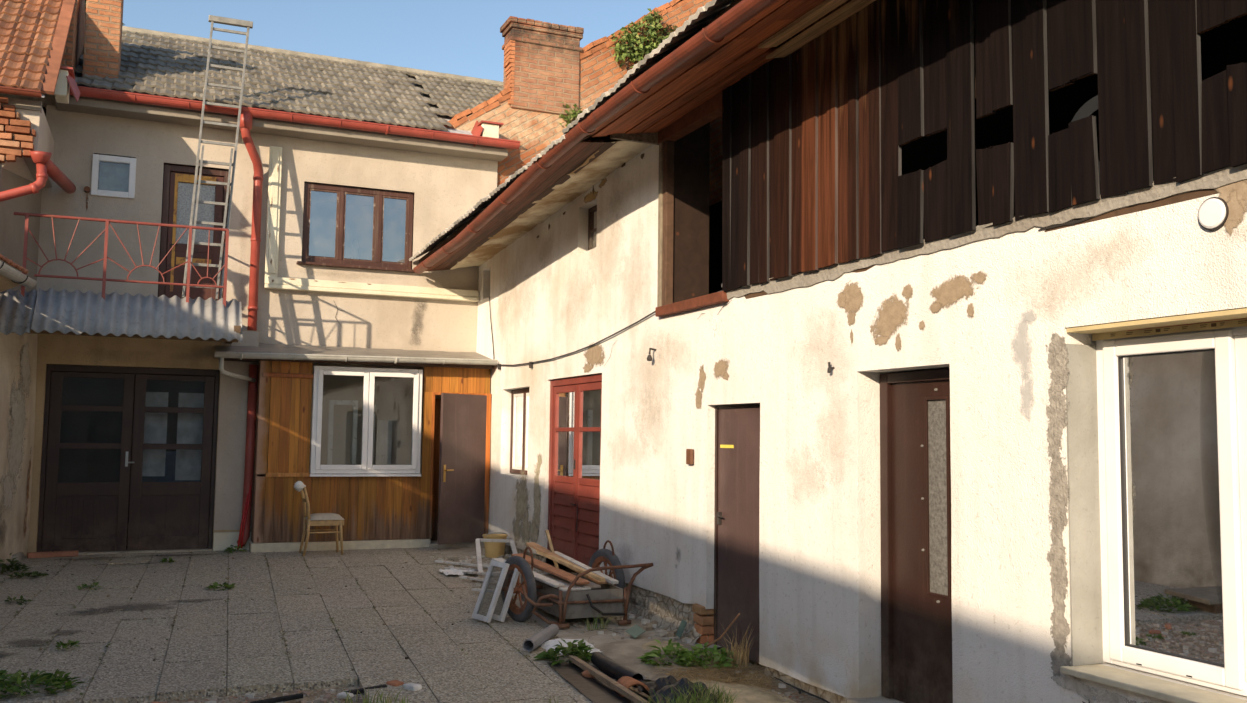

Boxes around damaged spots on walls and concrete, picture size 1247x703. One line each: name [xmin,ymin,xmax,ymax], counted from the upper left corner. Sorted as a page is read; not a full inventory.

flaking render [1216,180,1247,235]
peeling [902,284,913,299]
peeling [970,271,987,284]
peeling [837,293,856,343]
peeling [874,334,901,351]
peeling [1021,381,1033,418]
flaking render [1045,333,1145,703]